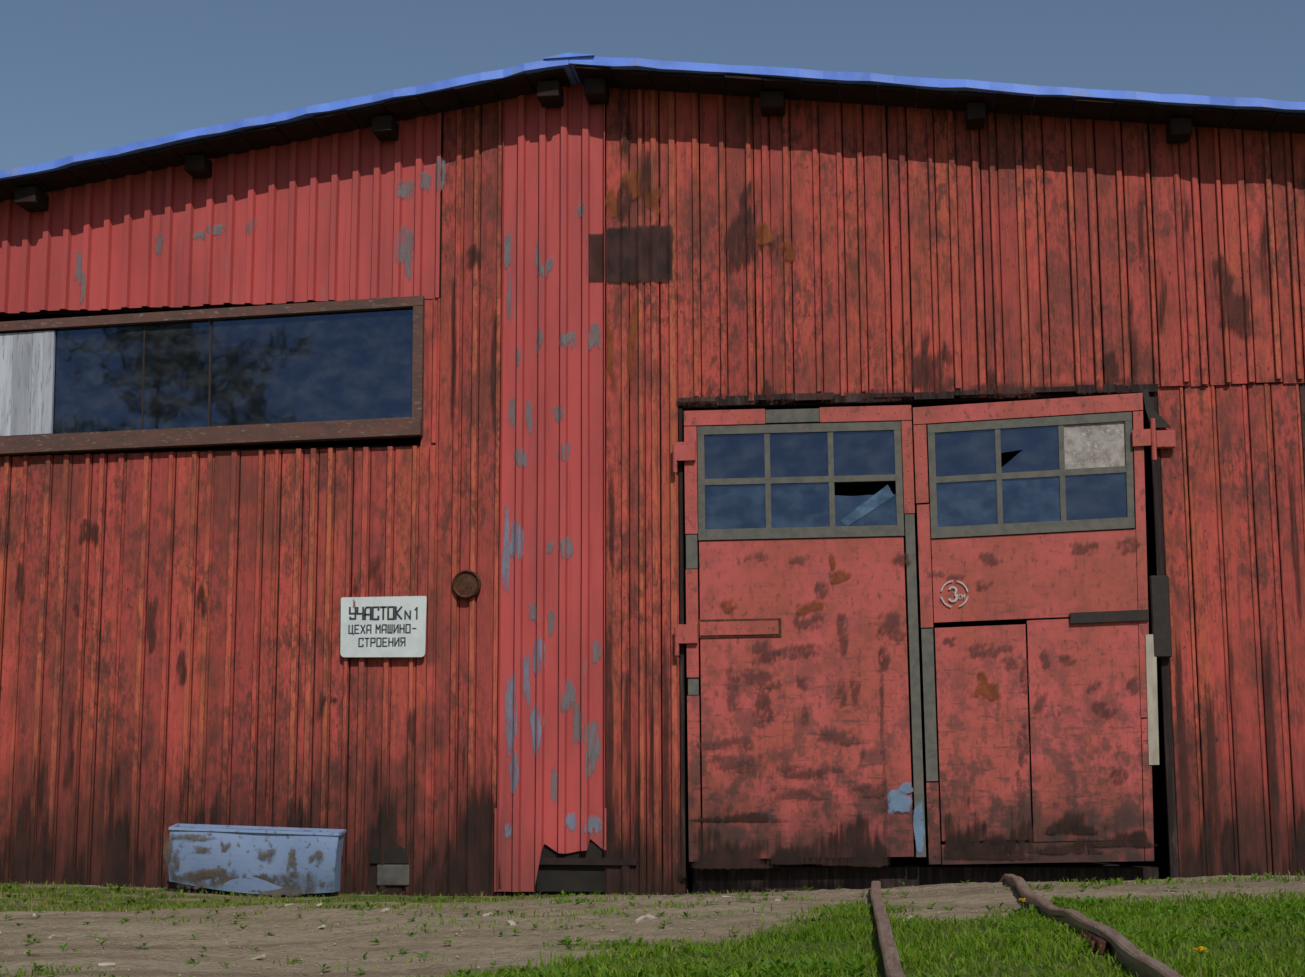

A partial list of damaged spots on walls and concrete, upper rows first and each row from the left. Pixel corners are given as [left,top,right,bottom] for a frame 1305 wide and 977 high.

peeling [397,157,446,200]
leakage [617,150,650,222]
leakage [725,182,783,269]
leakage [1213,254,1251,339]
peeling [502,505,524,591]
corrosion [829,553,851,583]
peeling [505,602,555,793]
peeling [561,679,601,777]
peeling [727,612,849,723]
corrosion [975,671,1000,700]
peeling [565,813,602,834]
peeling [854,778,925,853]